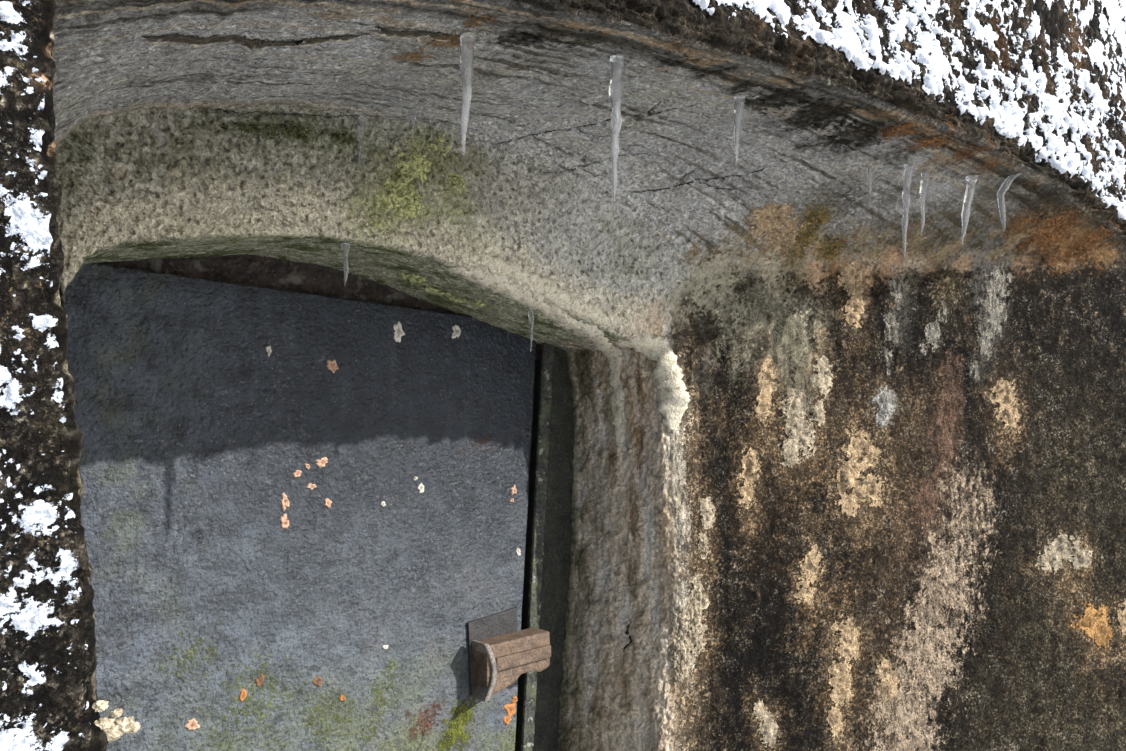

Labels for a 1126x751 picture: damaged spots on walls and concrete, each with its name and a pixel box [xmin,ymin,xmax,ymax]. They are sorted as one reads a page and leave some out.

damp [715,264,819,432]
damp [661,415,697,696]
damp [856,256,1014,751]